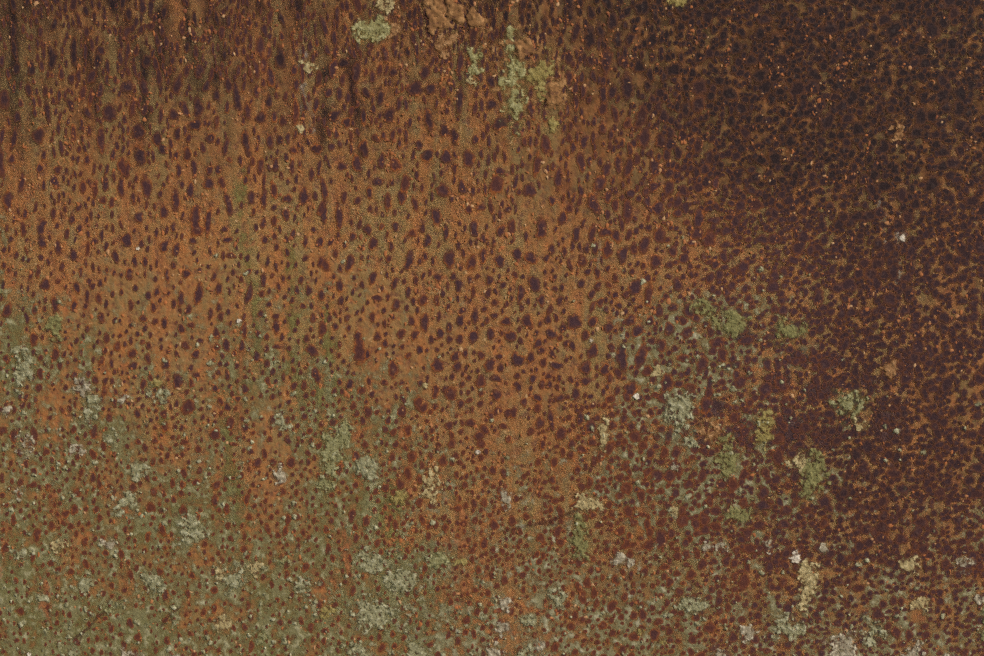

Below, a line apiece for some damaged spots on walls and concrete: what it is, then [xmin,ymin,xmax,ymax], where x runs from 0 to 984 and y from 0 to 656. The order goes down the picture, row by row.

rust [0,0,51,211]
rust [117,49,166,199]
rust [169,63,242,161]
rust [310,58,396,154]
rust [415,86,476,168]
rust [421,0,569,131]
rust [190,204,212,239]
rust [316,177,343,230]
rust [480,248,538,268]
rust [353,330,370,365]
rust [456,314,558,401]
rust [578,255,662,402]